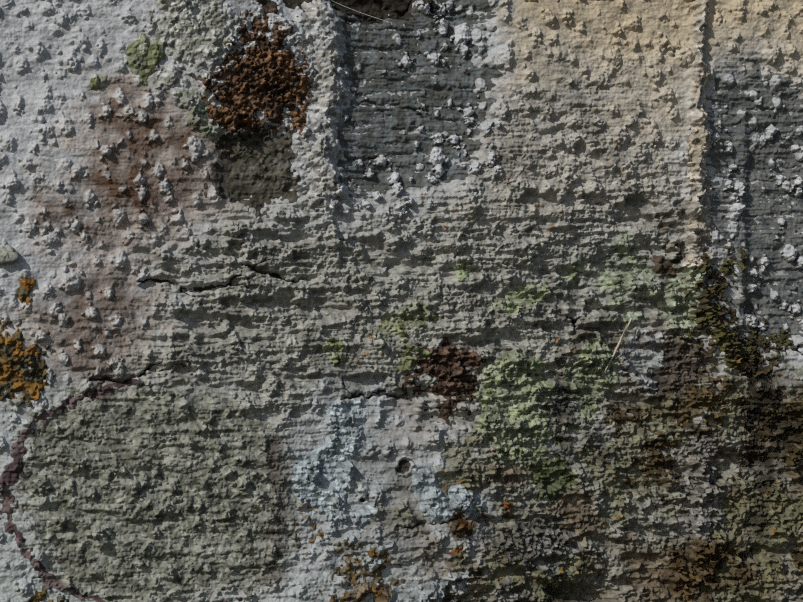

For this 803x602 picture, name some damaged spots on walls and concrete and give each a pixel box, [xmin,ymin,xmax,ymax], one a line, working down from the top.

crack [137,258,304,298]